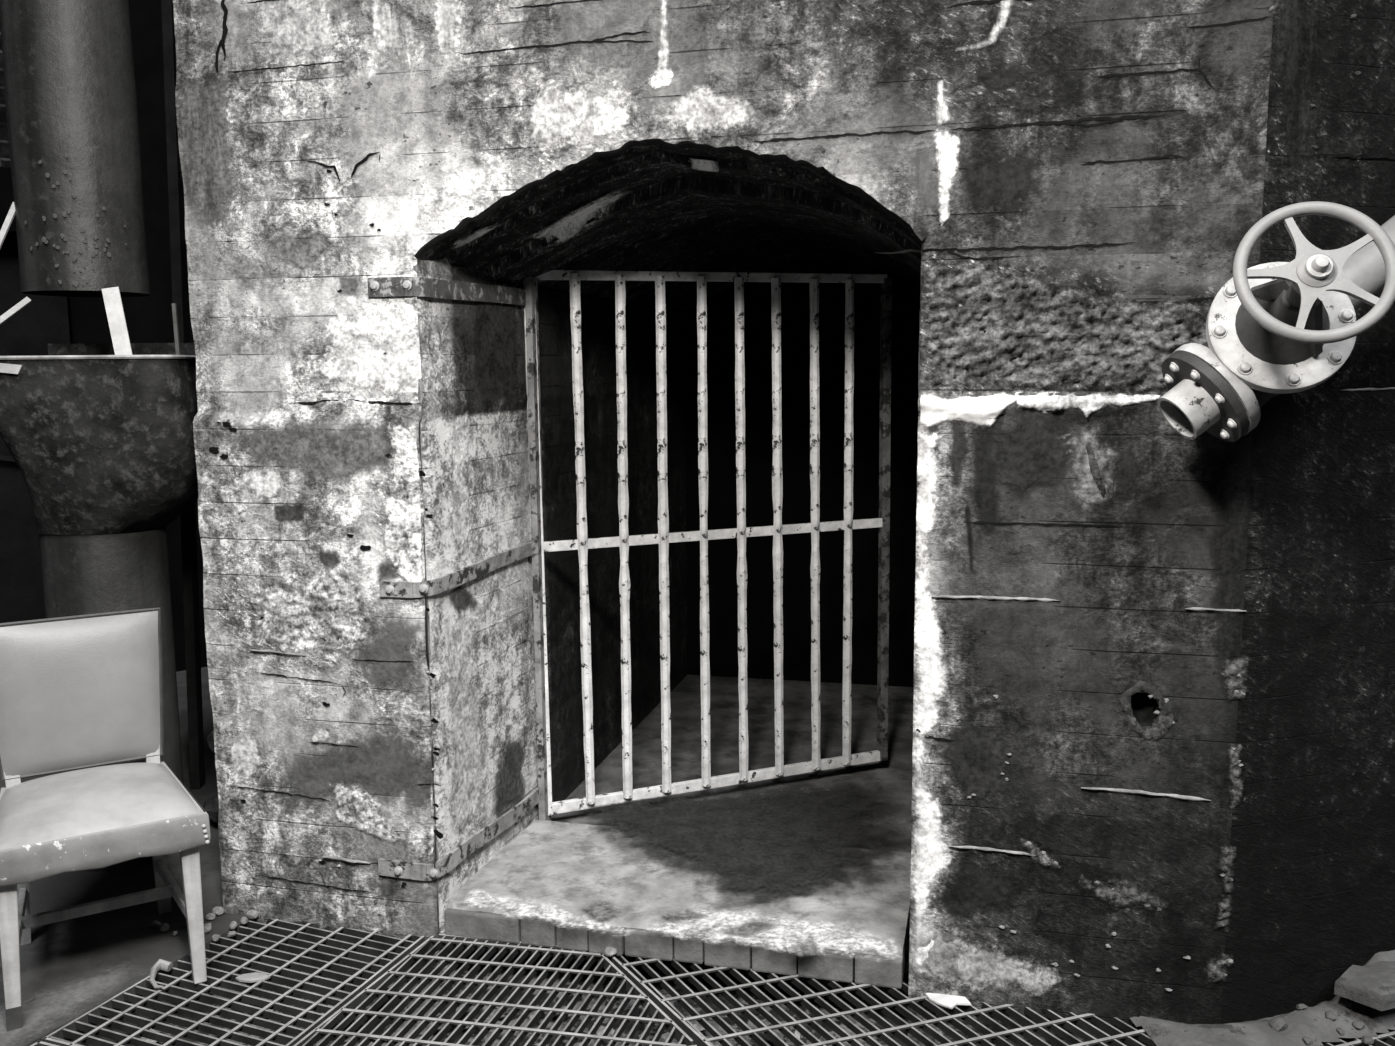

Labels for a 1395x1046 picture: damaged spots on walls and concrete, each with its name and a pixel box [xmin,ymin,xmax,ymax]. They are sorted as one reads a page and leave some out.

crack [215,0,343,73]
leakage [650,0,673,89]
leakage [656,87,755,140]
leakage [909,81,1033,221]
leakage [960,0,1011,50]
leakage [980,66,1025,90]
spalling [924,263,1209,391]
leakage [912,392,1160,996]
spalling [1124,694,1175,740]
leakage [589,779,895,957]